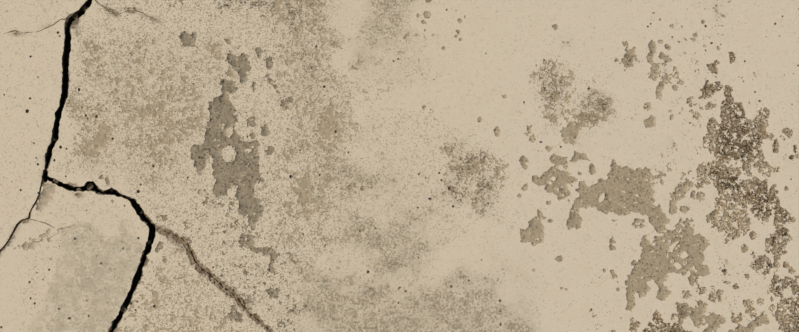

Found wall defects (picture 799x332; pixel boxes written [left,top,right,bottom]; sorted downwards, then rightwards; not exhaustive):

crack [0,0,274,332]
peeling [65,0,532,332]
peeling [517,0,799,332]